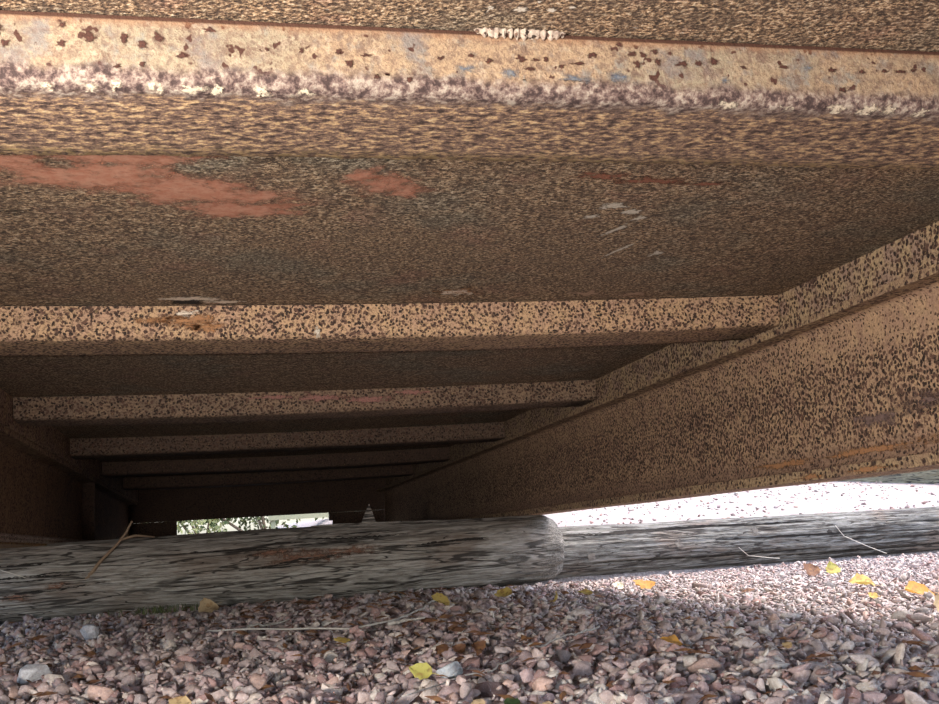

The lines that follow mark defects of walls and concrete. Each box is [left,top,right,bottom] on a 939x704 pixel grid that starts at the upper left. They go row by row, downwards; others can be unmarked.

rust [120,30,164,48]
rust [616,42,660,68]
rust [675,57,717,67]